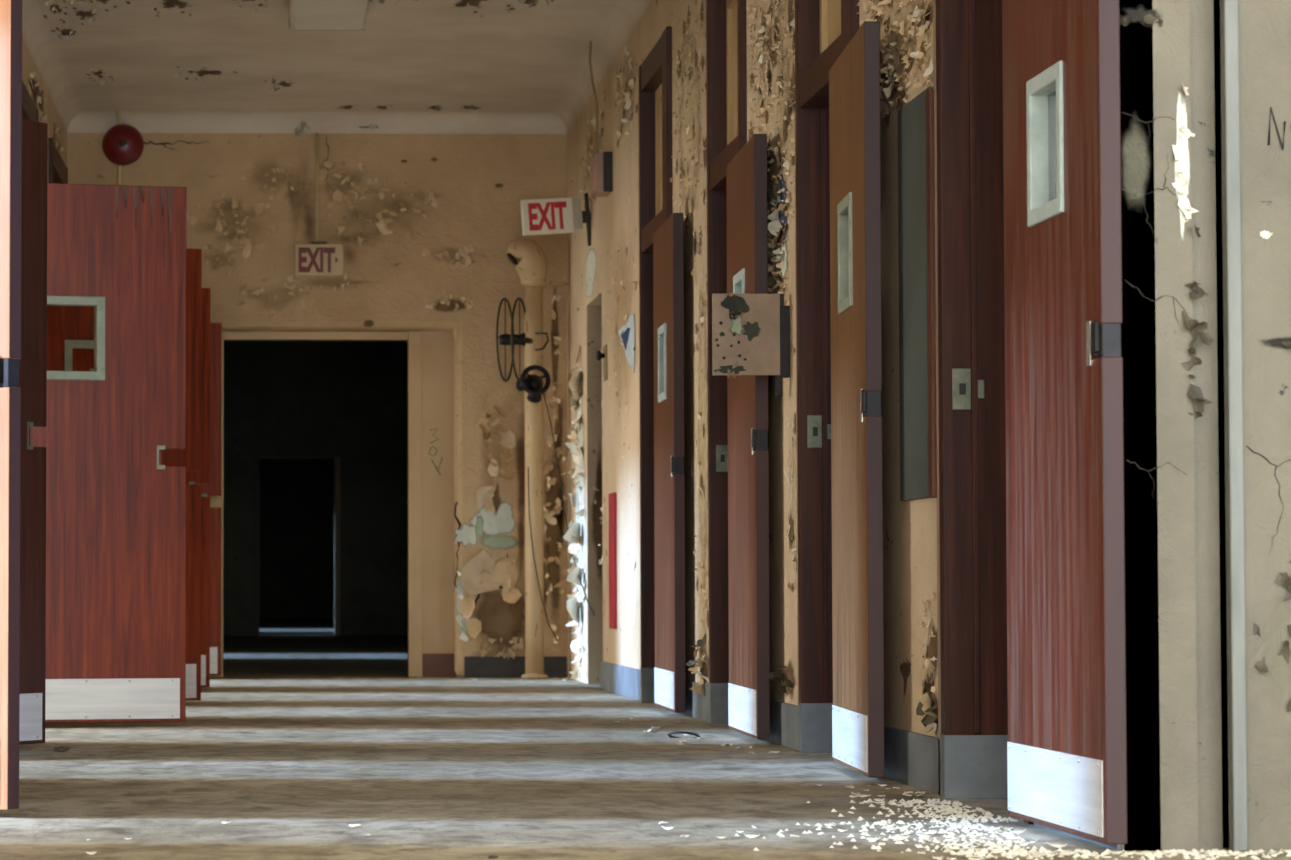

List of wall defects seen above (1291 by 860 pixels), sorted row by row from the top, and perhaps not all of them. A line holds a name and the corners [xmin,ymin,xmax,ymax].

peeling [43,0,131,44]
peeling [154,0,192,17]
peeling [455,0,553,18]
peeling [579,42,638,213]
peeling [746,0,795,306]
peeling [856,0,933,126]
peeling [1172,85,1201,238]
peeling [669,0,762,696]
peeling [1181,281,1214,419]
flaking render [454,397,525,660]
peeling [916,592,938,734]